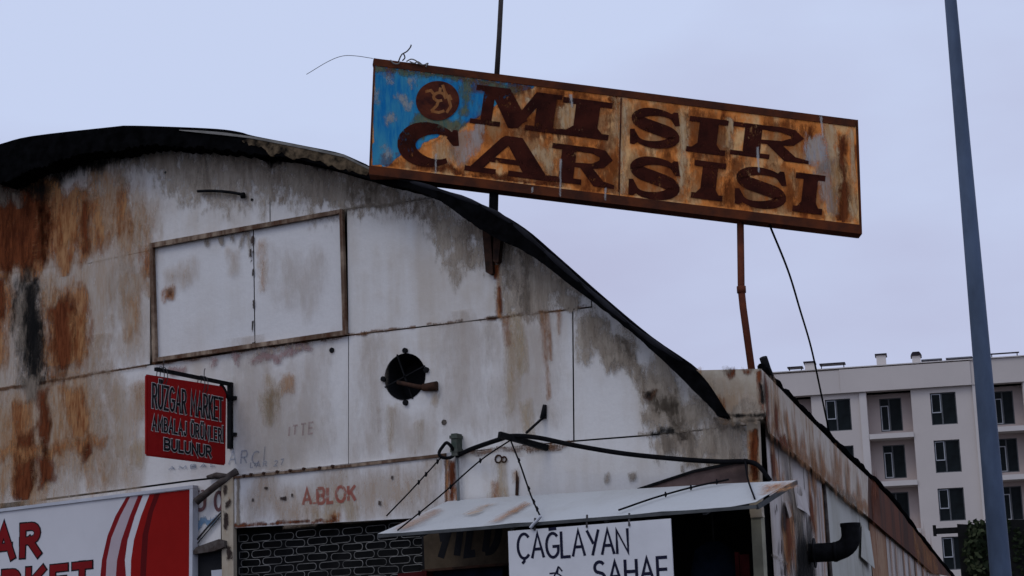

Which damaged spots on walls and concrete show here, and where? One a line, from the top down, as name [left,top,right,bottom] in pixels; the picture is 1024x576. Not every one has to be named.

rust [0,168,205,505]
leakage [0,150,484,505]
leakage [496,242,766,469]
rust [783,506,797,574]
rust [719,368,880,543]